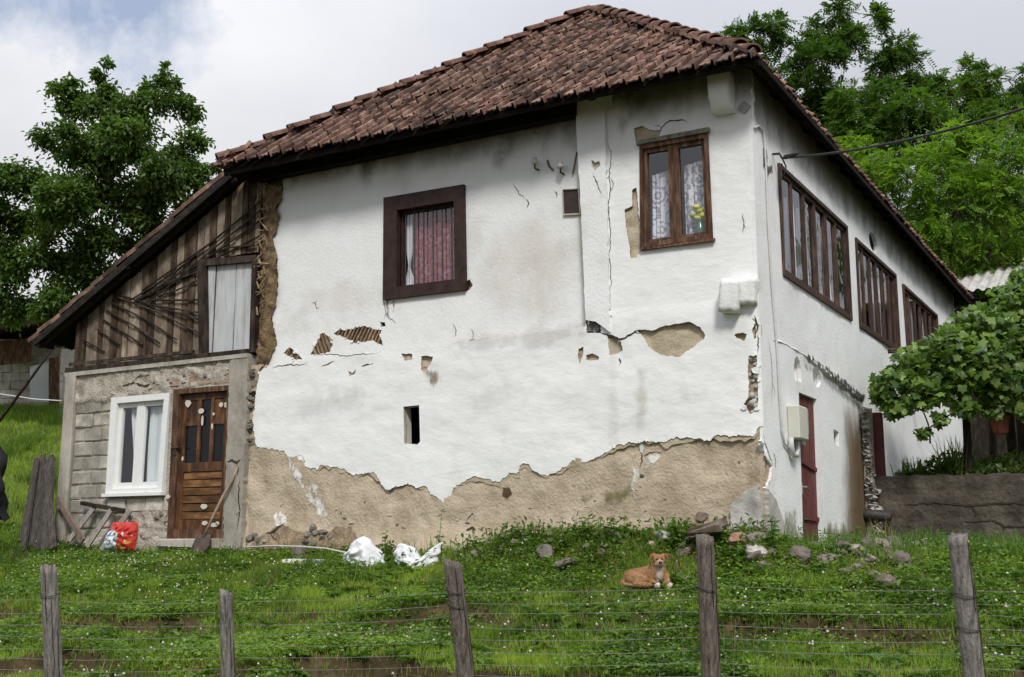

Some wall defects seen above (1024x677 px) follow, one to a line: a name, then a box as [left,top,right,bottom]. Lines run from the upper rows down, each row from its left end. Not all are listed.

crack [593,132,638,363]
peeling [626,189,642,258]
peeling [403,354,433,371]
peeling [579,337,623,362]
peeling [639,322,705,357]
spalling [741,352,761,414]
spalling [241,364,771,553]